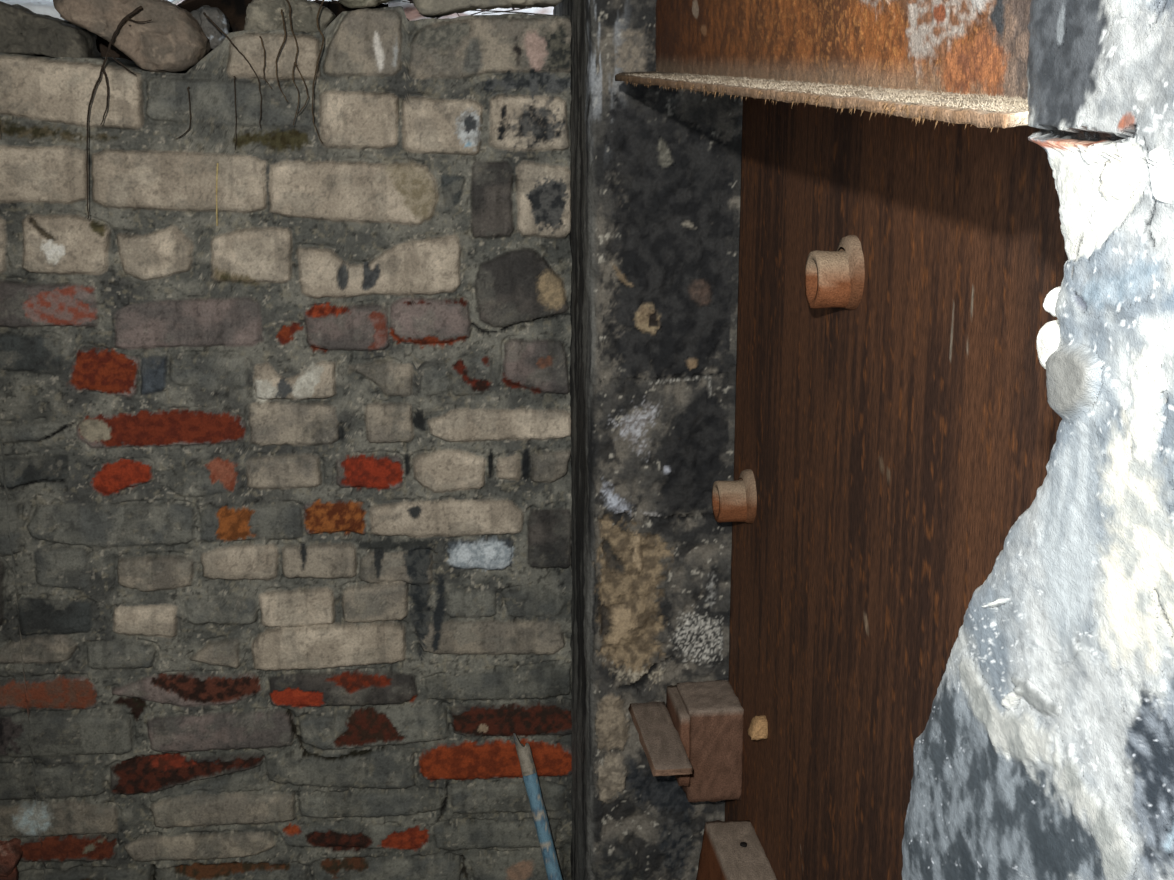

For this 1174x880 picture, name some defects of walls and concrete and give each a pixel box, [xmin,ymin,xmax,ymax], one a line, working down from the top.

corrosion [935,19,1013,97]
flaking render [1046,138,1174,268]